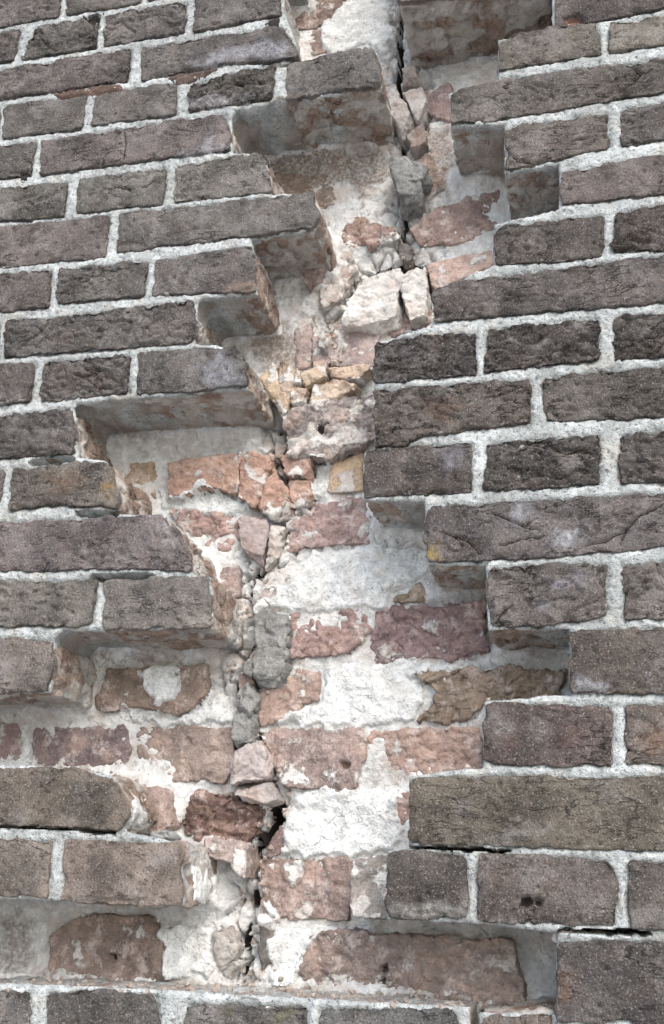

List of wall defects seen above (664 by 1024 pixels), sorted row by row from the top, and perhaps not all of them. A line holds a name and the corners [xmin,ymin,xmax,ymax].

spalling [168,65,223,88]
spalling [260,13,282,27]
flaking render [295,0,401,62]
crack [396,21,404,99]
spalling [425,83,453,123]
crack [350,221,423,297]
spalling [274,153,500,314]
spalling [293,310,433,371]
crack [167,360,372,529]
spalling [0,394,568,1011]
crack [256,785,287,859]
crack [244,890,262,975]